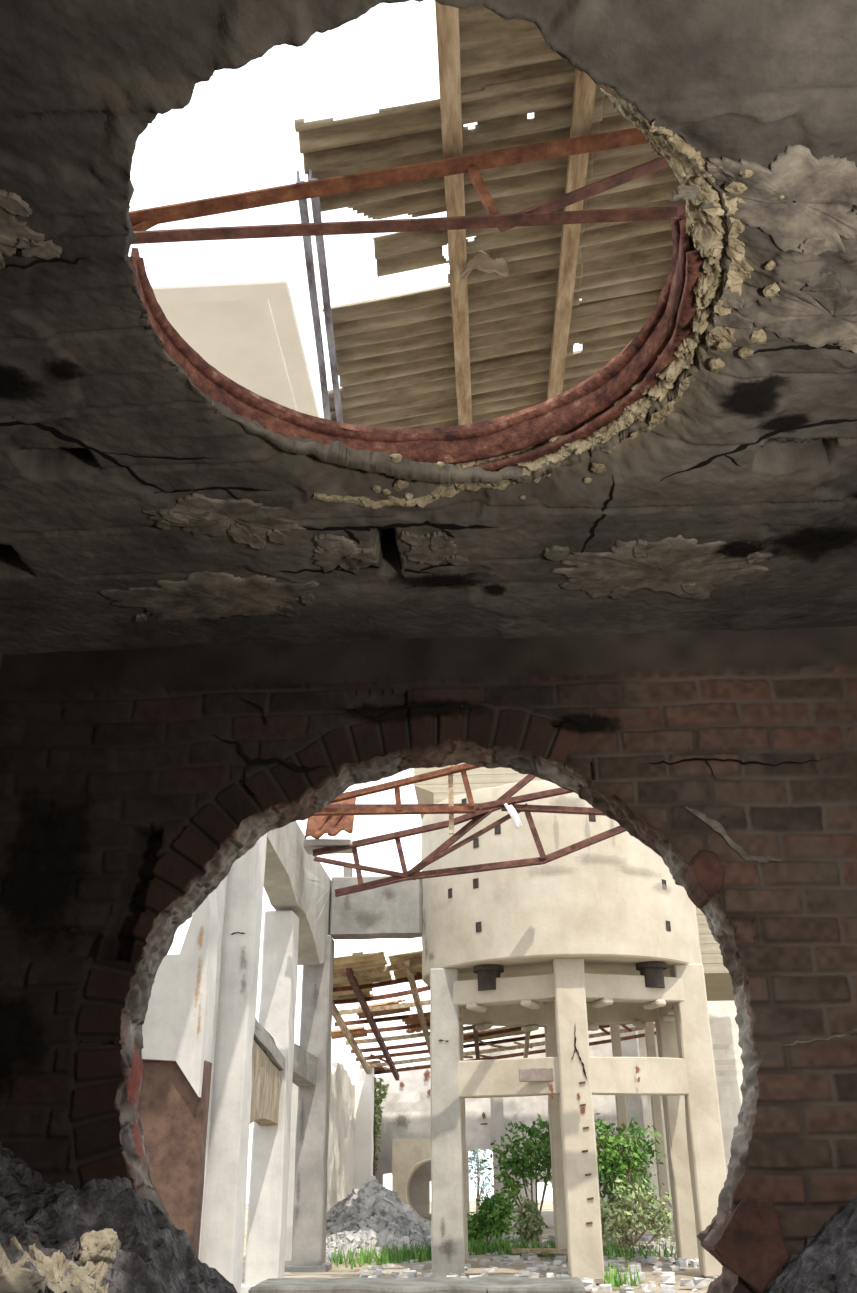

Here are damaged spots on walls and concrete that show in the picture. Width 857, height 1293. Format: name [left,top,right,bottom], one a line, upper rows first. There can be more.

peeling [0,189,62,269]
spalling [312,88,857,509]
crack [0,416,271,500]
crack [660,419,857,481]
crack [581,475,615,553]
peeling [543,535,775,600]
crack [572,1029,587,1080]